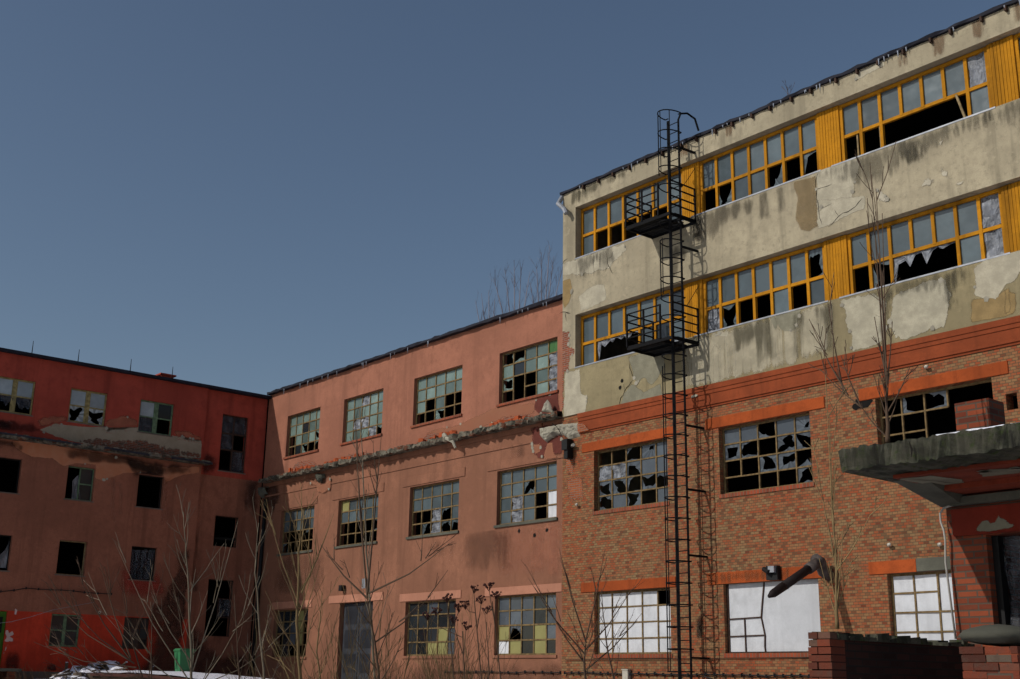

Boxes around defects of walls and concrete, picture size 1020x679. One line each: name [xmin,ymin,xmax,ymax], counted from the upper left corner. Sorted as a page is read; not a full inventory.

crack [815,174,861,227]
flaking render [815,159,865,229]
flaking render [973,251,1020,302]
leakage [686,303,832,385]
flaking render [840,277,951,351]
flaking render [418,369,588,459]
flaking render [12,423,202,482]
peeling [977,516,1014,532]